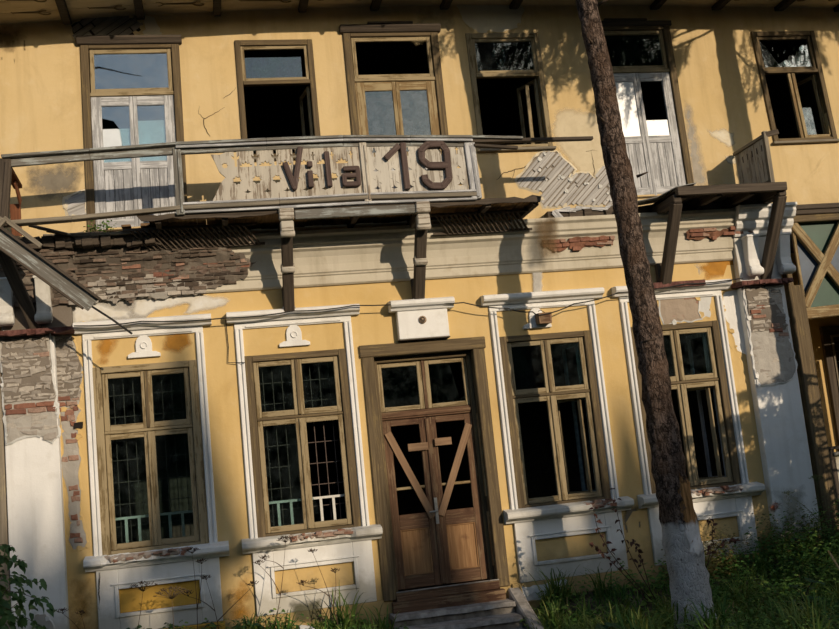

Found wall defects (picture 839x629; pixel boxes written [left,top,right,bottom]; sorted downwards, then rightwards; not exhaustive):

peeling [709,129,734,146]
water stain [31,166,78,196]
flaking render [554,235,615,252]
flaking render [686,226,753,240]
flaking render [14,261,36,303]
flaking render [35,239,257,323]
flaking render [659,286,798,387]
flaking render [0,330,91,553]